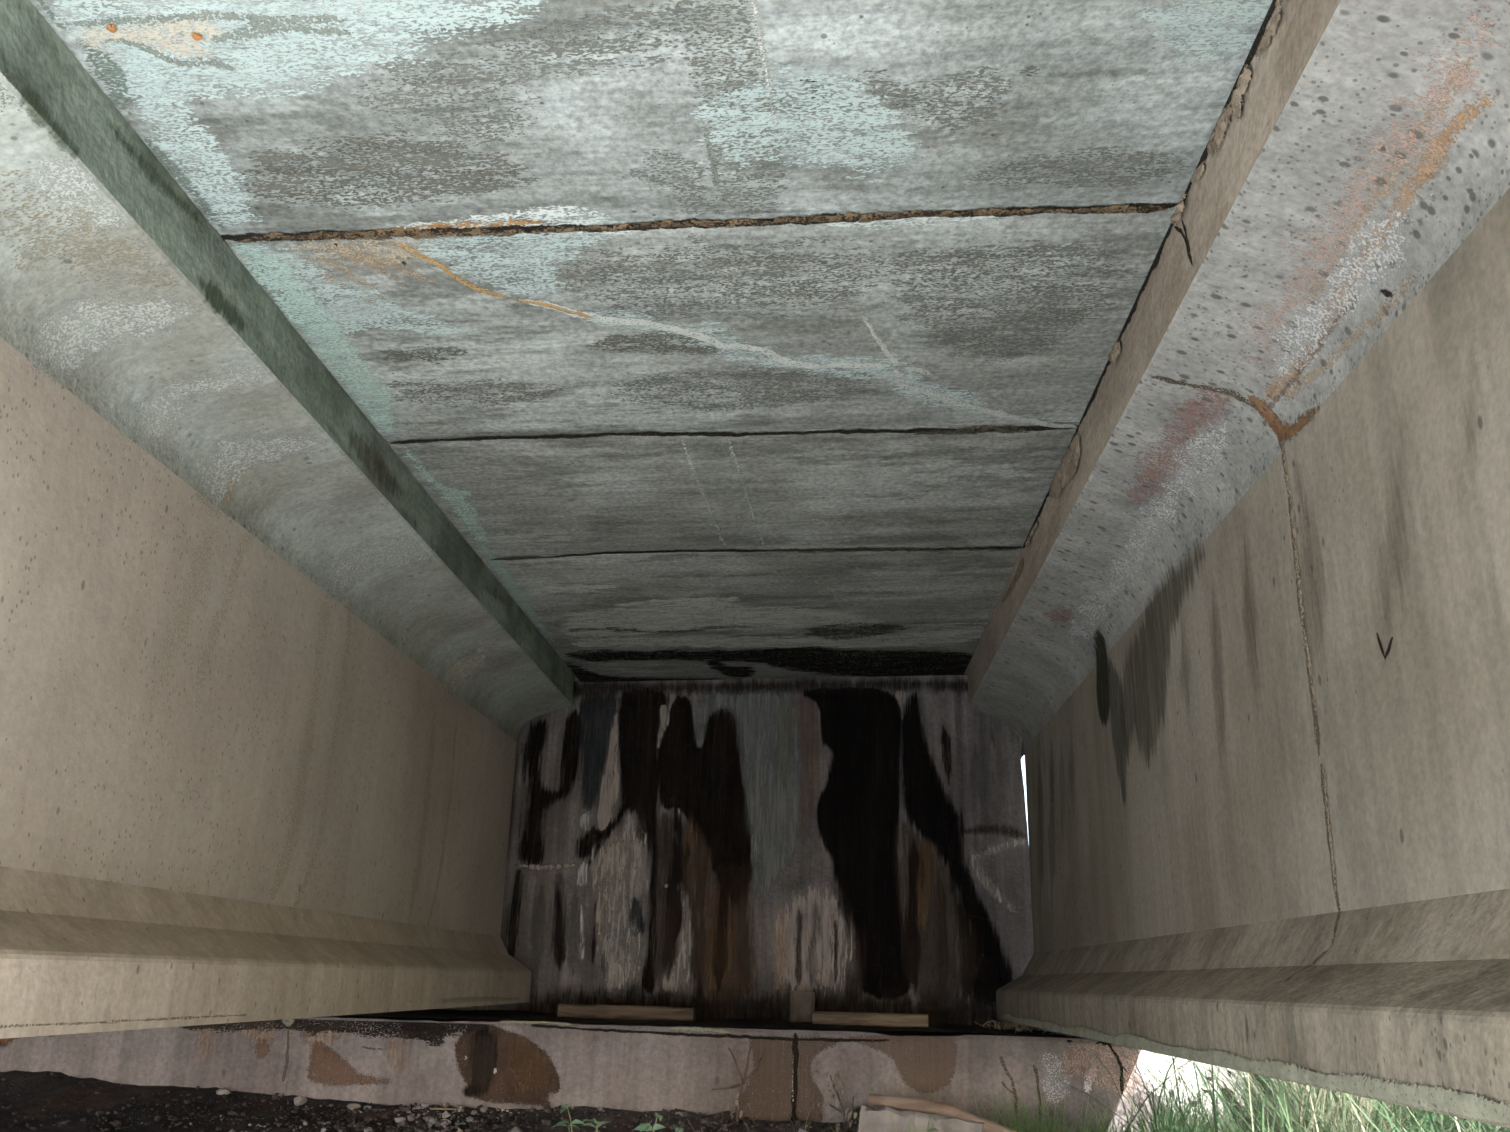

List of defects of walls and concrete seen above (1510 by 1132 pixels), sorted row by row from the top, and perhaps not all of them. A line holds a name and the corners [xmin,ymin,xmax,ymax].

rust [273,217,558,306]
crack [390,0,1277,449]
damp [1121,385,1238,508]
damp [37,0,1145,1122]
crack [1023,488,1050,549]